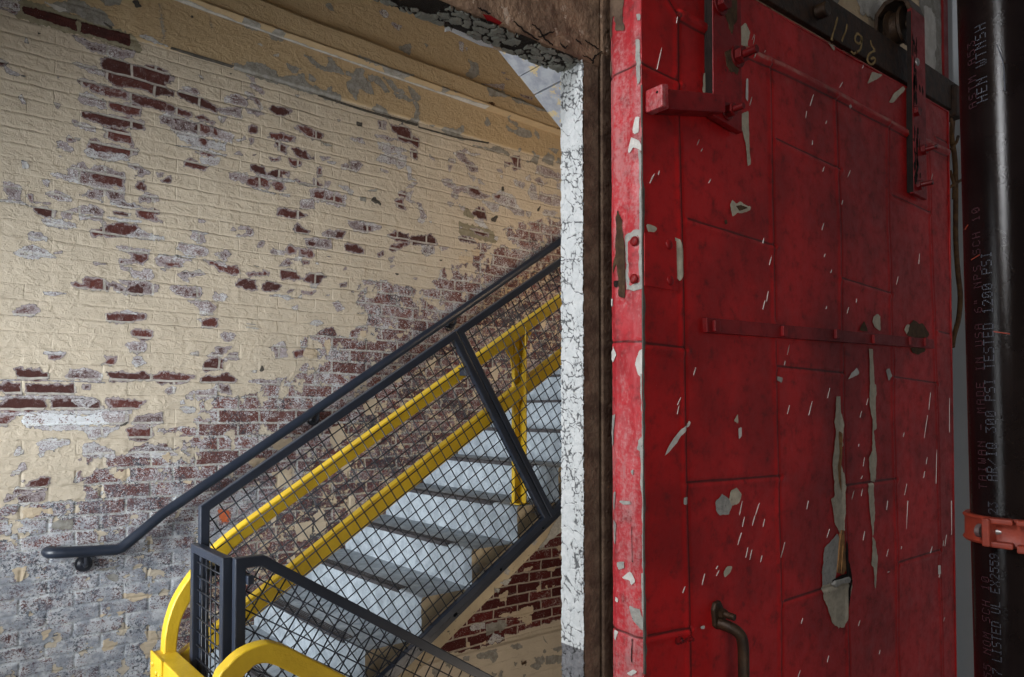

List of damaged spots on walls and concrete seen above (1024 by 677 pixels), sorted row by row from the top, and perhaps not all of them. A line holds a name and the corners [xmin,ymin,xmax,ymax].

peeling [373,0,584,112]
peeling [611,117,657,306]
peeling [0,17,563,677]
crack [478,7,603,677]
peeling [715,488,742,515]